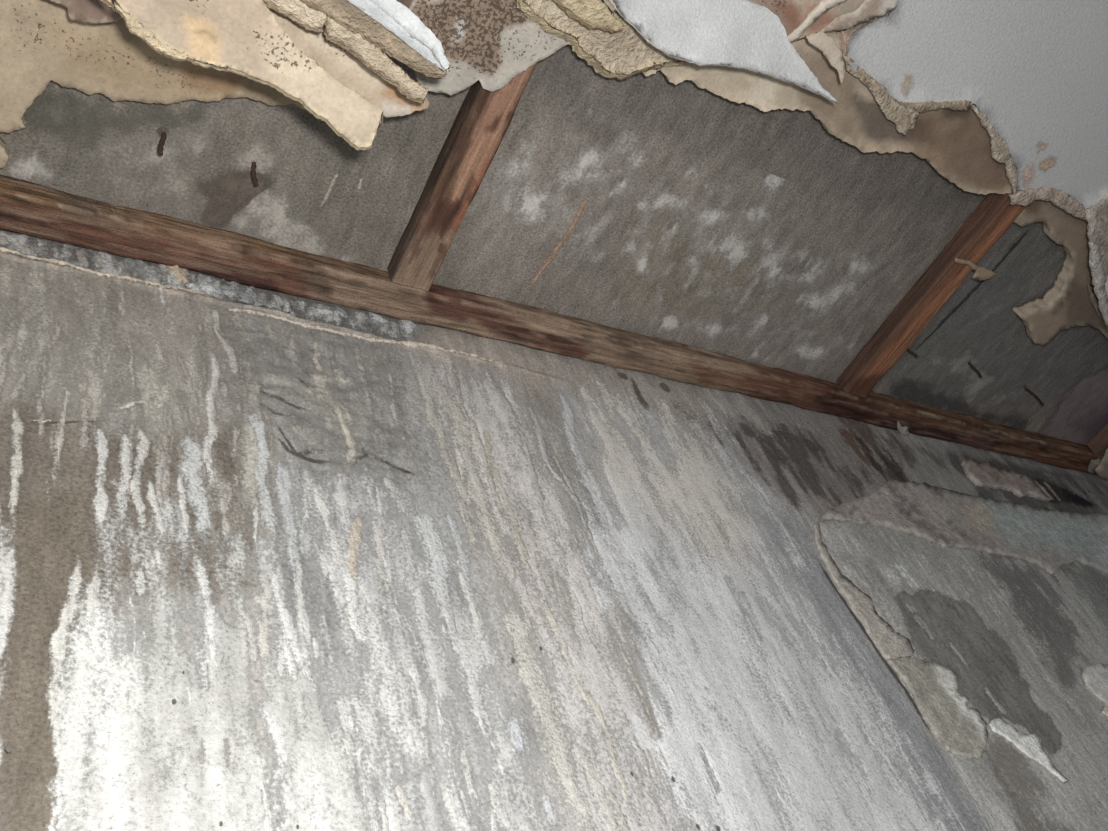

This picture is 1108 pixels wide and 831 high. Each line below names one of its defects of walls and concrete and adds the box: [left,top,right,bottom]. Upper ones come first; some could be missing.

peeling [748,0,898,85]
leakage [485,140,643,225]
leakage [765,174,785,193]
spalling [1009,187,1088,222]
leakage [625,223,679,273]
leakage [637,192,873,317]
peeling [897,420,909,436]
leakage [892,349,1038,430]
leakage [0,231,991,831]
flaking render [813,458,1108,784]
leakage [986,734,1074,831]